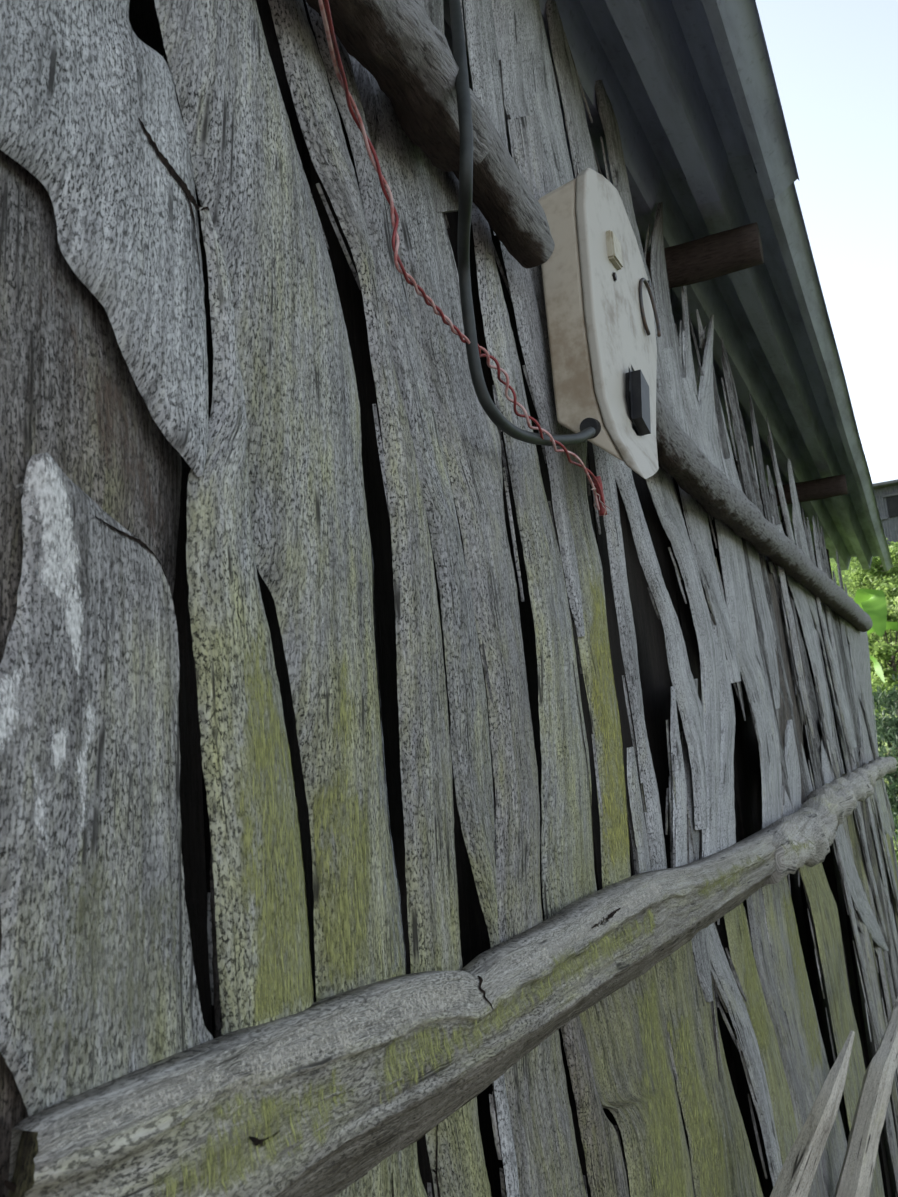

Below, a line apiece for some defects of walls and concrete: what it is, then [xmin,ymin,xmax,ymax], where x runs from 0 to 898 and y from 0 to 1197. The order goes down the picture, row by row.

crack [472,975,494,1016]